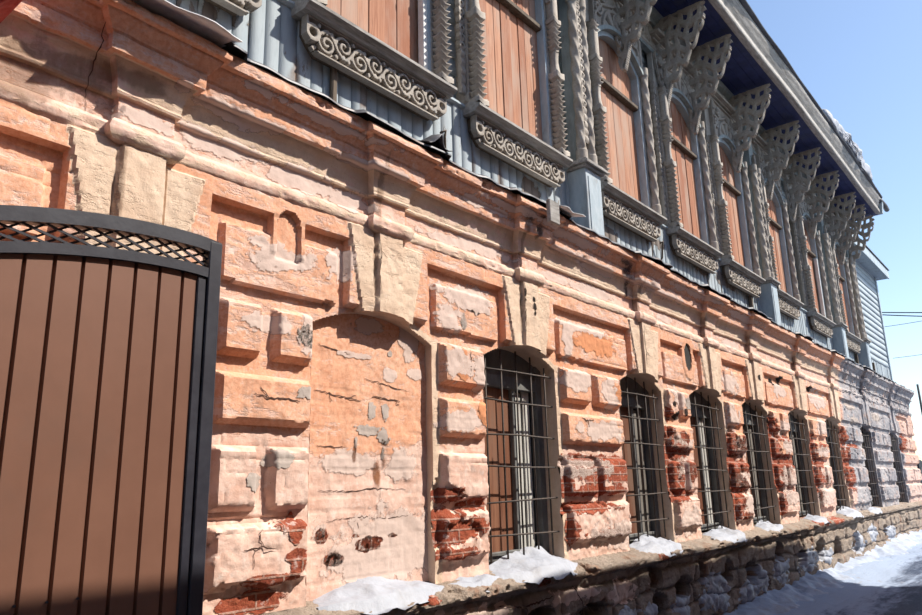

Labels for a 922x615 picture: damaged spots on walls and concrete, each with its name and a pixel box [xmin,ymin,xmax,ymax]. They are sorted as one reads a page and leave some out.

crack [85,22,106,111]
peeling [81,79,380,213]
peeling [448,188,765,327]
crack [255,378,409,405]
peeling [428,281,494,435]
peeling [554,316,608,393]
spalling [557,376,632,550]
spalling [664,383,703,539]
peeling [721,368,755,526]
spalling [767,414,800,516]
peeling [807,387,836,505]
peeling [214,487,490,615]